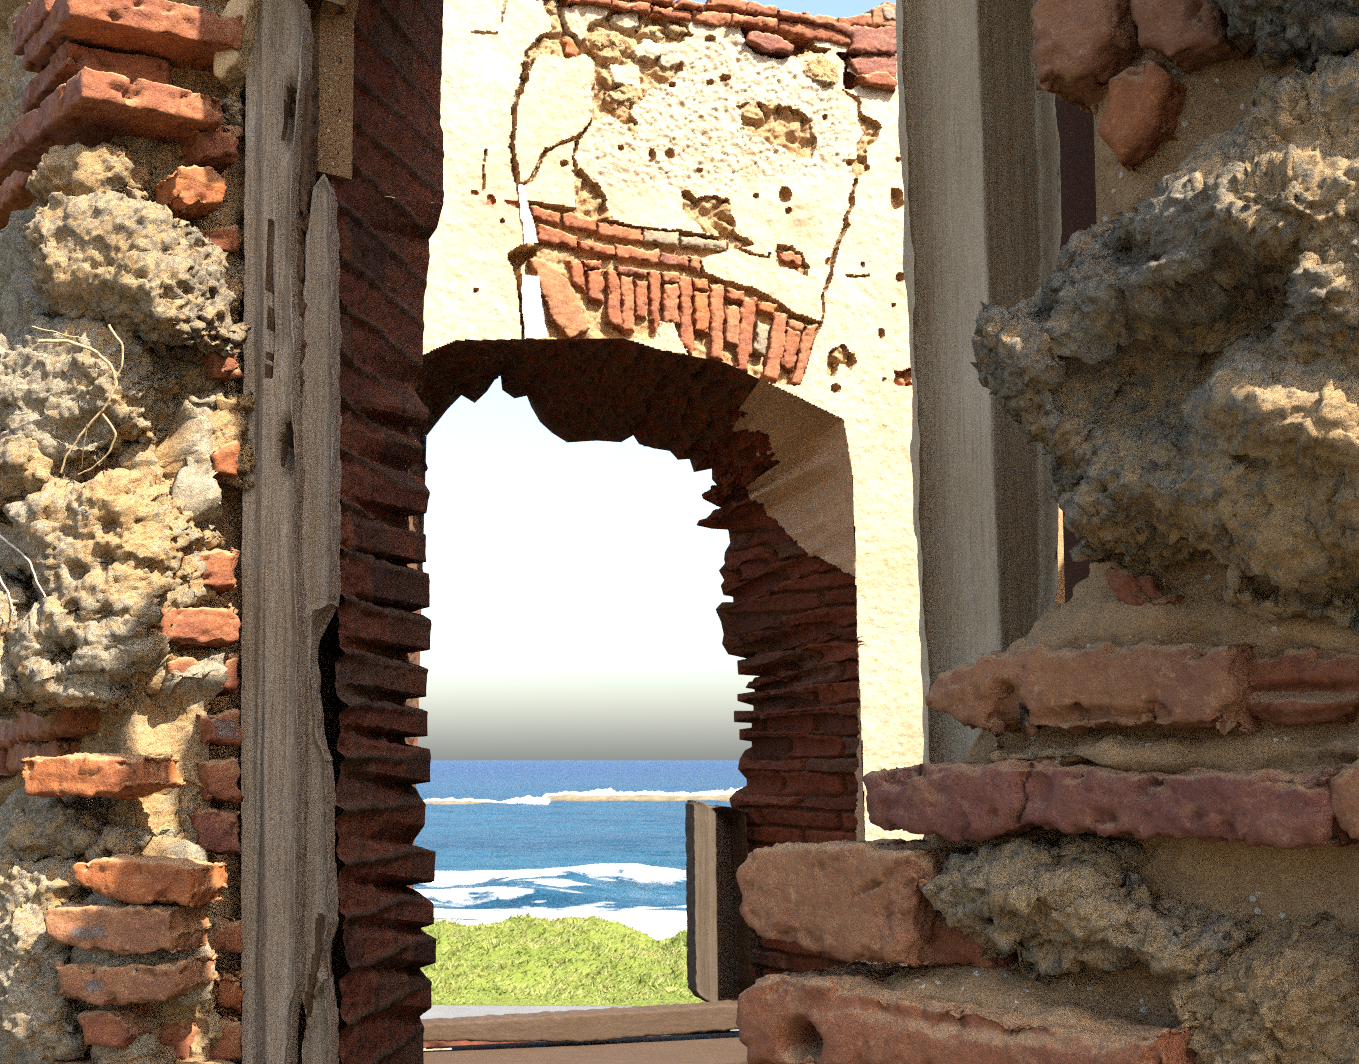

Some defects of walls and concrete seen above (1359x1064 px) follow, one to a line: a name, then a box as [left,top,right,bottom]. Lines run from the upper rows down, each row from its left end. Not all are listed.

spalling [520,0,716,151]
spalling [764,29,831,89]
crack [482,70,593,192]
spalling [648,147,675,162]
spalling [736,101,828,159]
spalling [681,189,755,249]
spalling [779,186,792,215]
crack [734,247,772,258]
spalling [775,244,831,276]
crack [818,178,870,326]
crack [507,243,538,345]